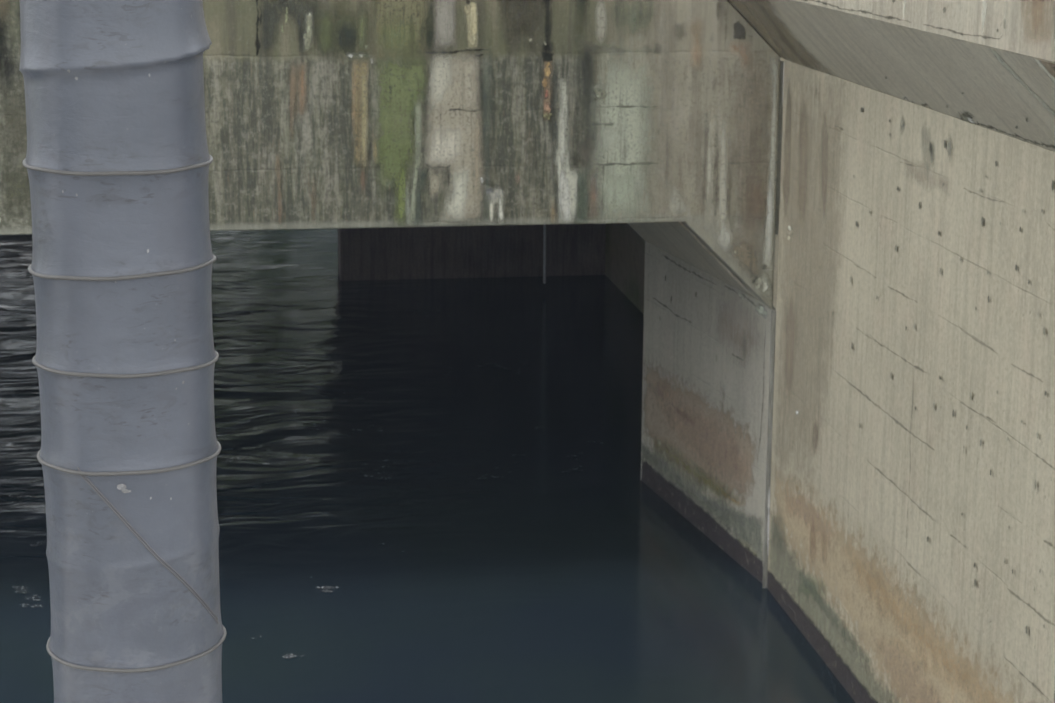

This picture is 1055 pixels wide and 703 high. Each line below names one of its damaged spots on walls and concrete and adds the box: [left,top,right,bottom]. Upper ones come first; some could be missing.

damp [0,27,14,86]
damp [398,105,425,221]
damp [641,460,877,703]